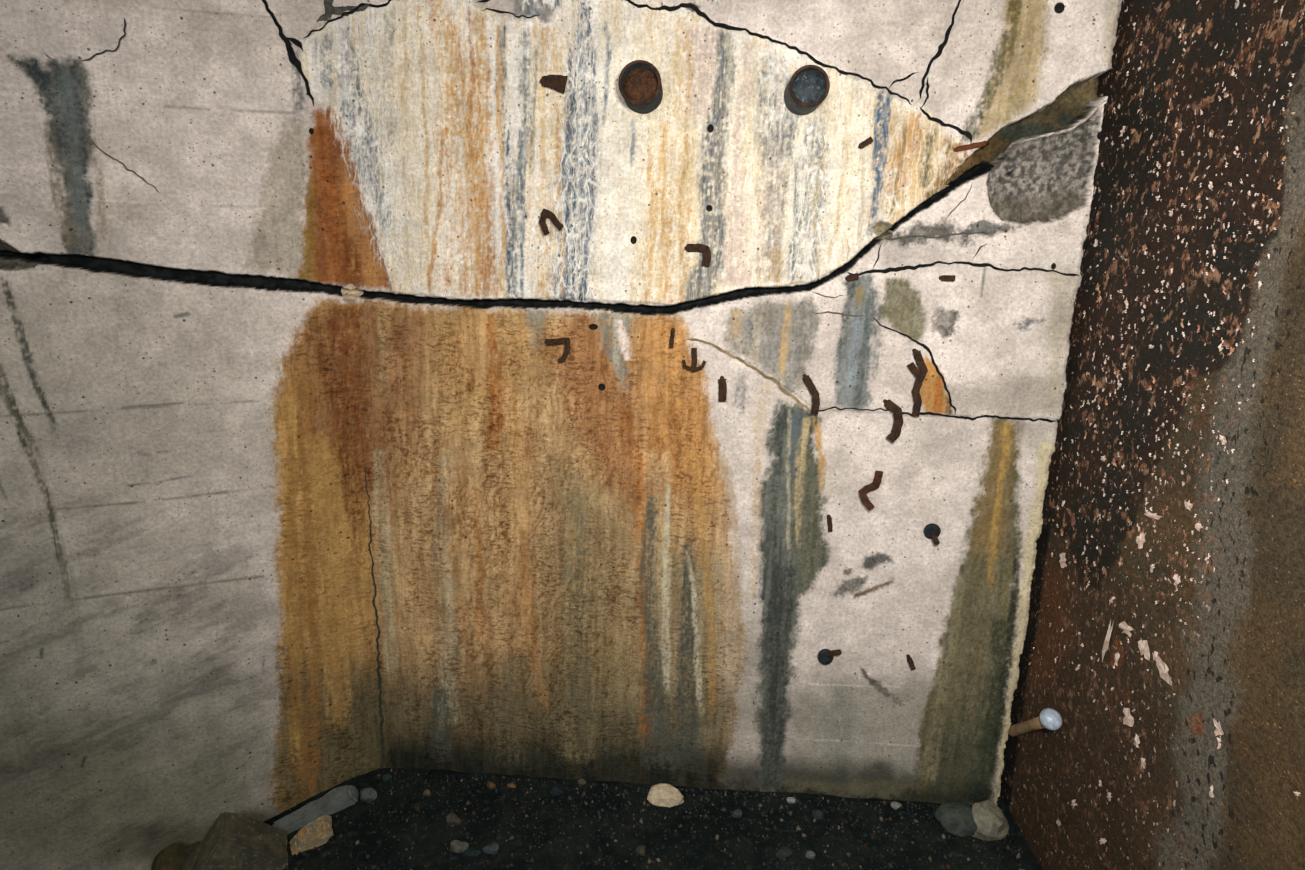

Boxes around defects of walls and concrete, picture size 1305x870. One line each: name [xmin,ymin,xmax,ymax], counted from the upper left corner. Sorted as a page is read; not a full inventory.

damp [0,50,112,256]
corrosion [263,102,754,815]
crack [0,0,1080,422]
damp [238,0,1058,805]